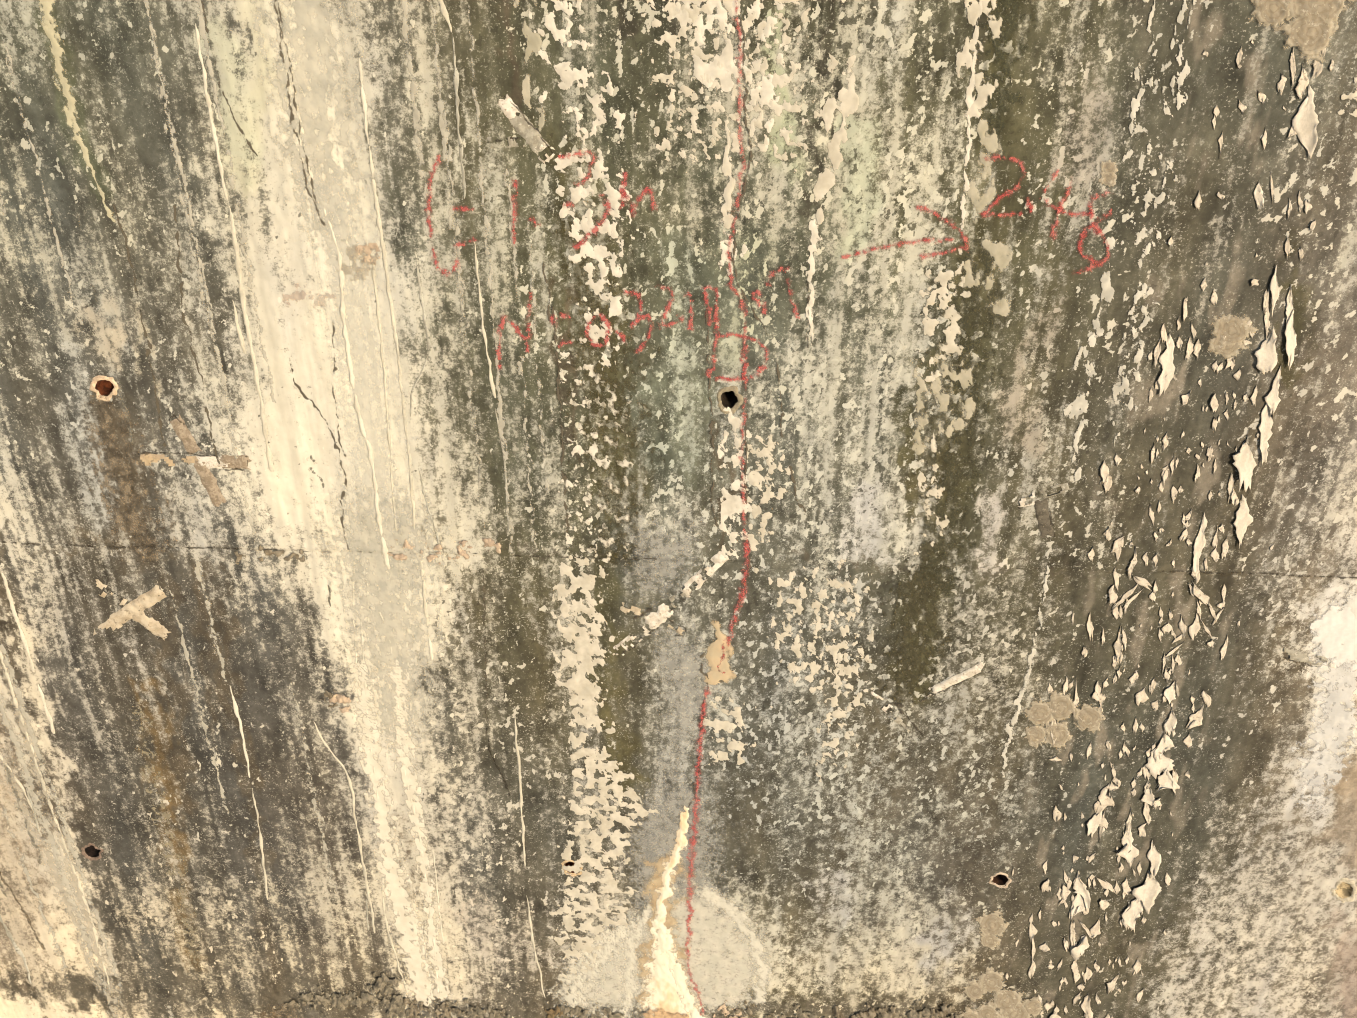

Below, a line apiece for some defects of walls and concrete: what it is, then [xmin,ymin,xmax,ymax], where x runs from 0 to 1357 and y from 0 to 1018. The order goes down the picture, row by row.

damp [39,0,116,222]
damp [195,561,268,900]
damp [254,0,454,1018]
damp [427,0,514,553]
peeling [513,0,660,980]
damp [526,625,771,1018]
peeling [640,0,859,225]
peeling [712,407,794,559]
peeling [754,559,879,782]
peeling [909,239,1013,556]
damp [899,0,1038,603]
peeling [1015,0,1304,1018]